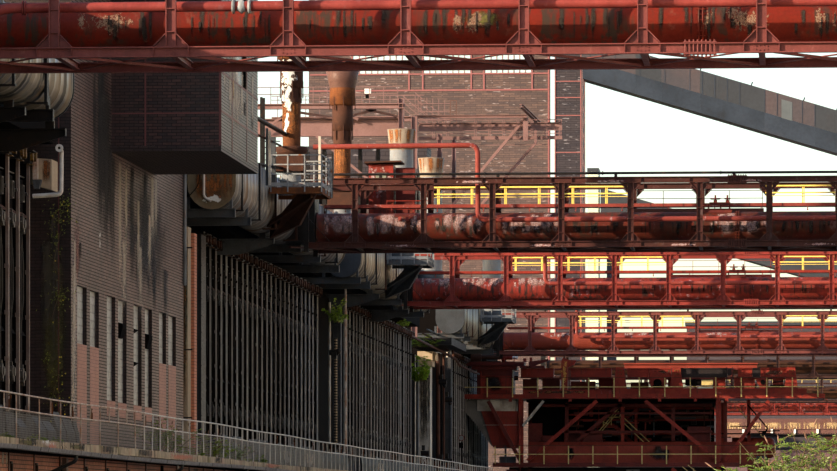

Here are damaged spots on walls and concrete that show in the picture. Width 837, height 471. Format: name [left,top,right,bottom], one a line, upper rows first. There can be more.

peeling [78,13,133,35]
peeling [452,10,497,33]
peeling [726,7,756,31]
peeling [815,6,836,30]
peeling [282,72,297,134]
corrosion [389,129,415,142]
corrosion [334,149,348,170]
corrosion [419,158,443,169]
damp [93,73,167,305]
peeling [367,215,420,234]
peeling [435,214,482,230]
peeling [503,214,558,232]